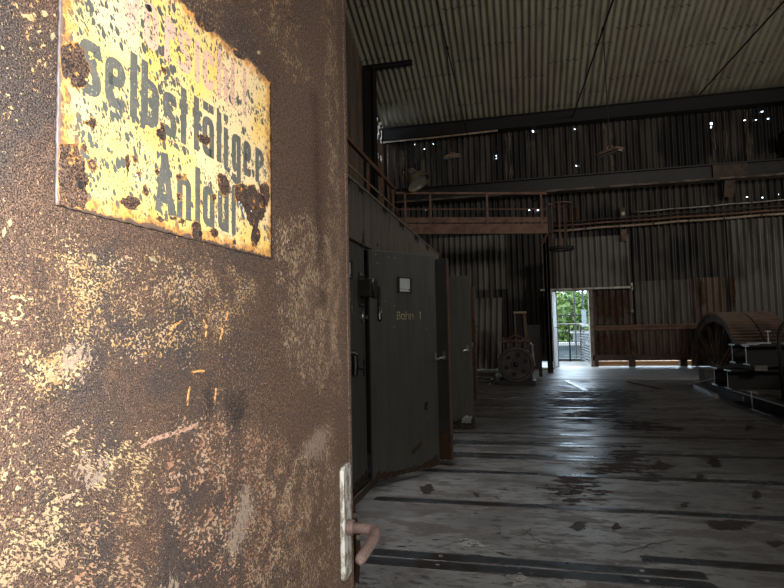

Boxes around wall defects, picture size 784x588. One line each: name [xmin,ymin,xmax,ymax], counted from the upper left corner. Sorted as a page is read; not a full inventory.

peeling [11,0,56,73]
peeling [272,0,363,400]
peeling [0,239,260,402]
peeling [0,406,340,588]
damp [536,444,663,506]
damp [542,387,683,434]